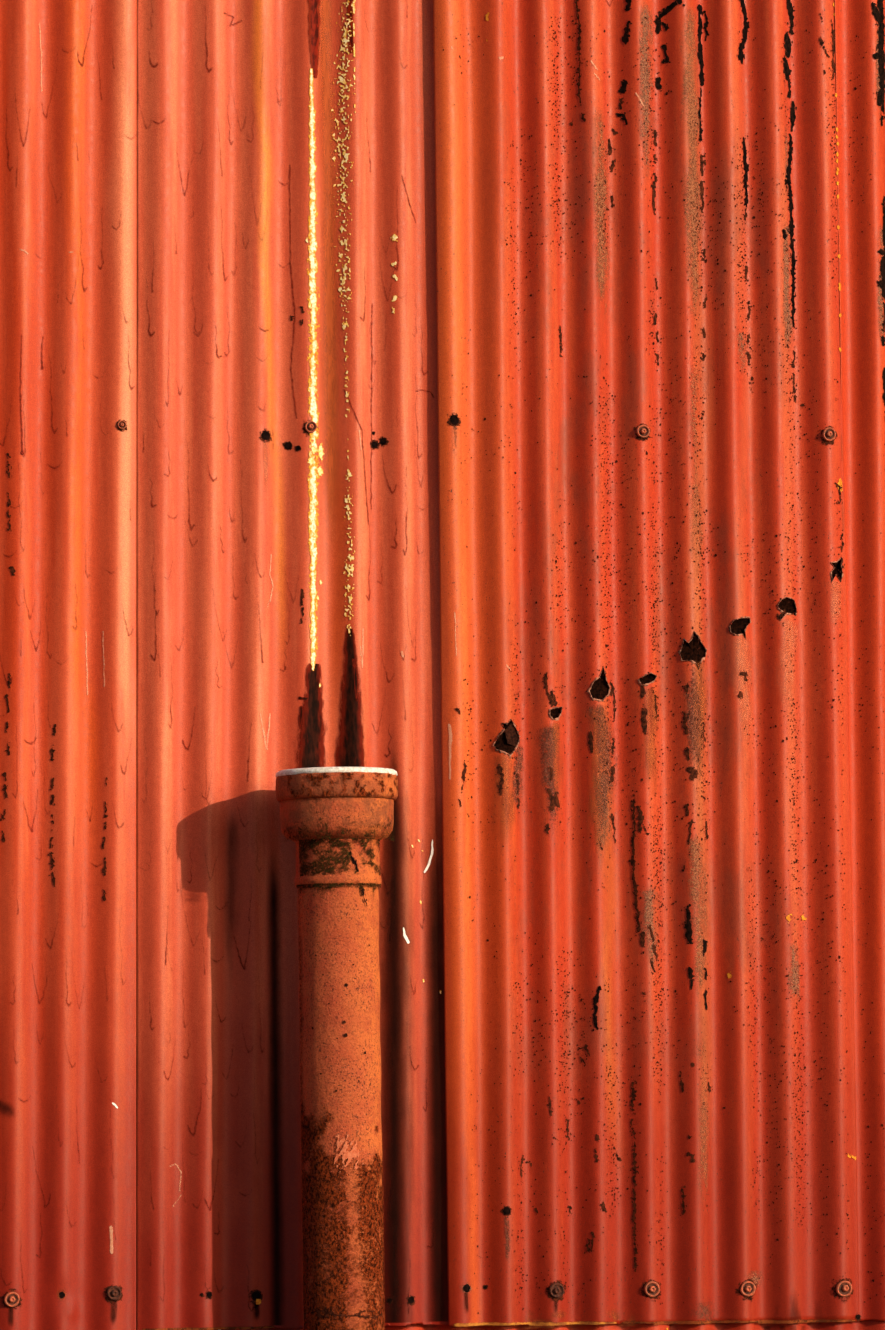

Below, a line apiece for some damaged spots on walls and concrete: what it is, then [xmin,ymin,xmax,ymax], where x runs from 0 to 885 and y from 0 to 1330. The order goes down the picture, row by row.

peeling [595,0,708,311]
peeling [783,0,797,169]
peeling [872,0,885,126]
rust [286,629,398,798]
rust [447,16,885,1327]